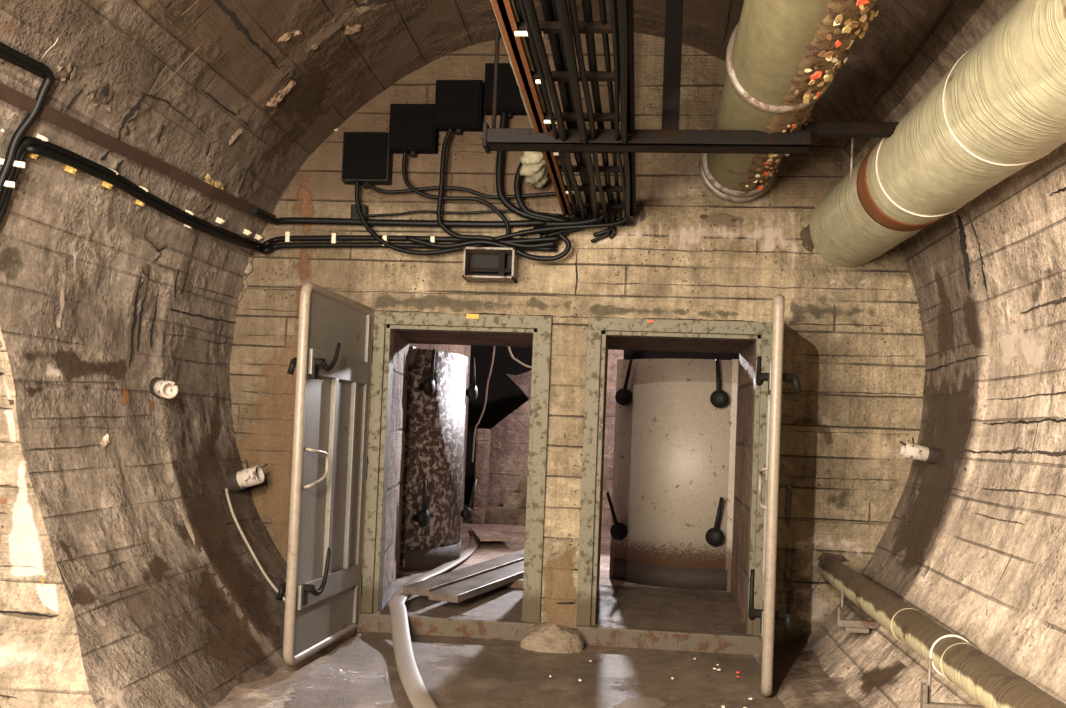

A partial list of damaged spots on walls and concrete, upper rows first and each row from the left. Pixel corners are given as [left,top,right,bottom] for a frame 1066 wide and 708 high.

crack [100,0,300,194]
crack [957,213,987,292]
rust [296,248,309,314]
crack [802,320,883,328]
crack [1021,297,1066,314]
water stain [25,350,127,389]
crack [786,354,1066,456]
crack [784,474,885,482]
crack [903,483,1066,525]